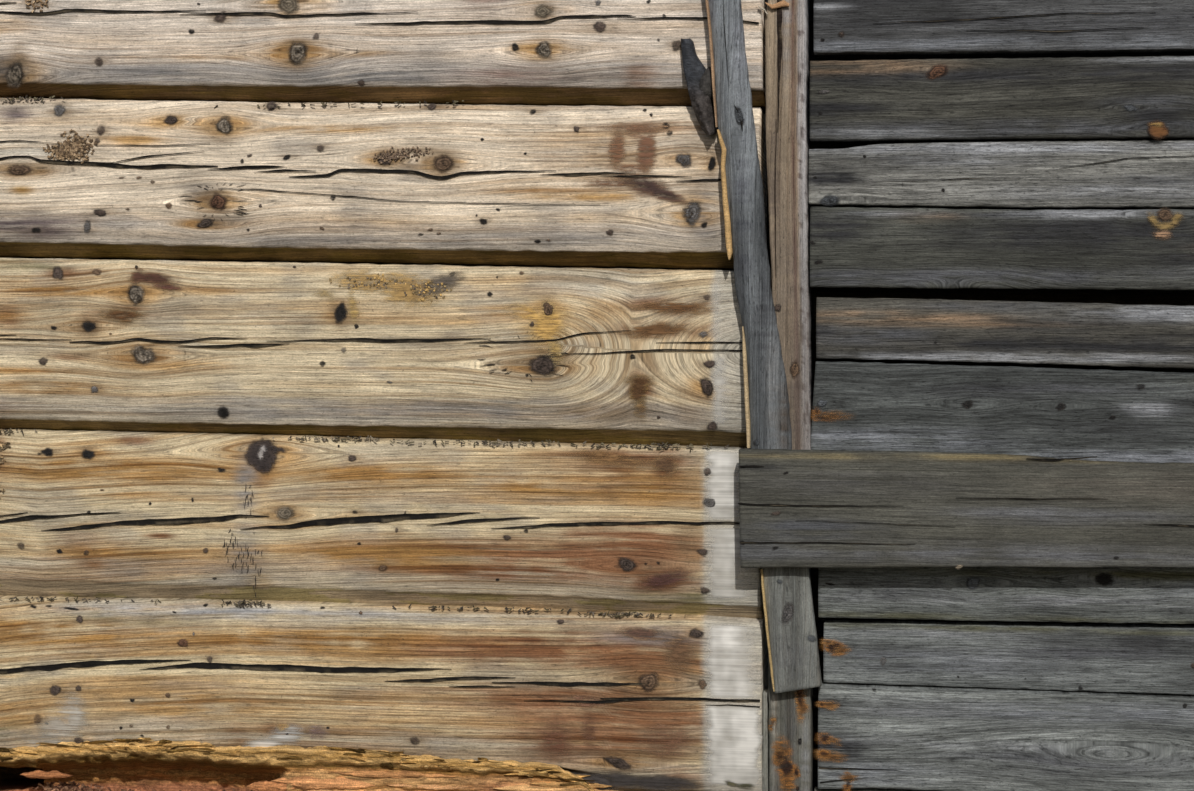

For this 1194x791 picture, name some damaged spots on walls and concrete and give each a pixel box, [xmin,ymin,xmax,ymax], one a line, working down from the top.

crack [0,0,782,259]
crack [0,503,955,545]
rust [822,639,849,655]
crack [0,659,760,707]
rust [795,689,837,719]
peeling [0,737,238,762]
peeling [323,745,595,791]
rust [769,718,800,789]